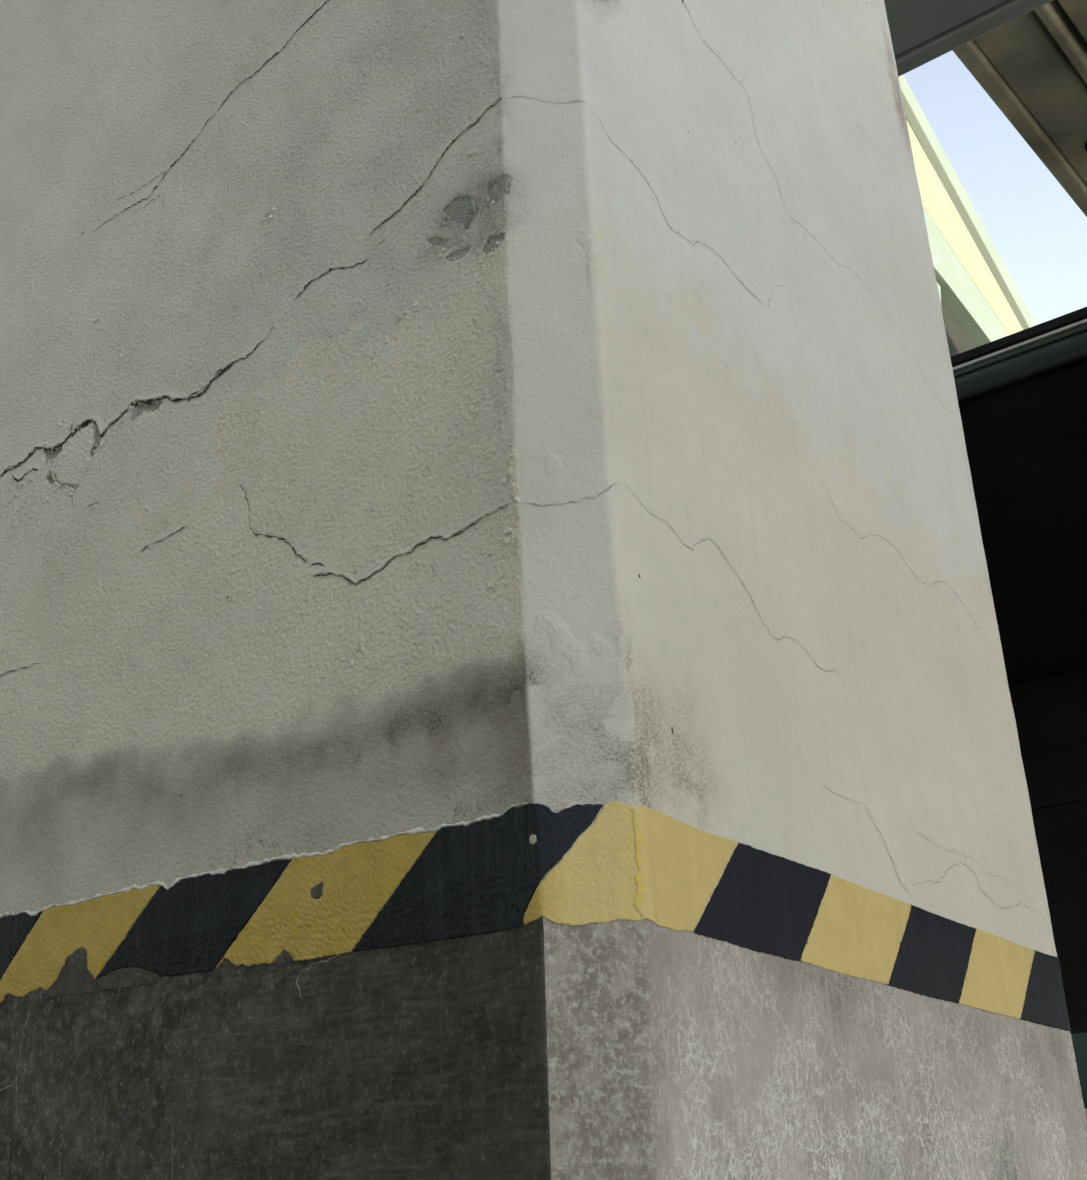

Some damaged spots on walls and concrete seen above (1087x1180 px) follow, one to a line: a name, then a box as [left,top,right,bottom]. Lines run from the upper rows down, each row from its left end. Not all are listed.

crack [92,0,329,232]
crack [294,96,809,311]
peeling [44,424,101,485]
crack [0,326,274,528]
crack [241,483,1043,917]
peeling [46,948,159,998]
peeling [0,802,531,918]
peeling [270,949,295,966]